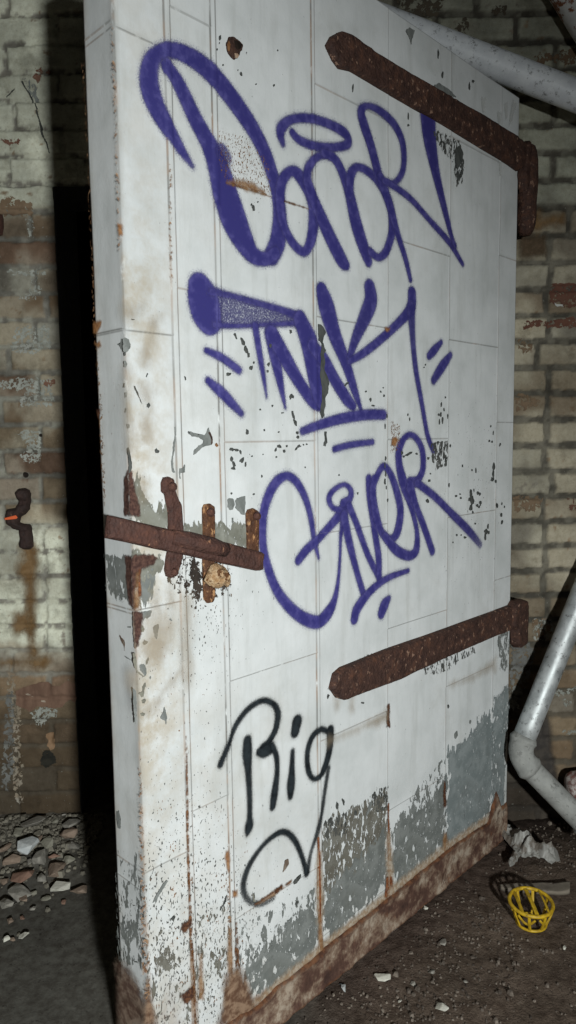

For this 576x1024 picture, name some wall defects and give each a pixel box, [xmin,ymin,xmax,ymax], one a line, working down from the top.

corrosion [123,470,140,517]
corrosion [124,554,157,647]
corrosion [181,756,203,1024]
peeling [115,617,554,1024]
corrosion [220,803,489,1024]